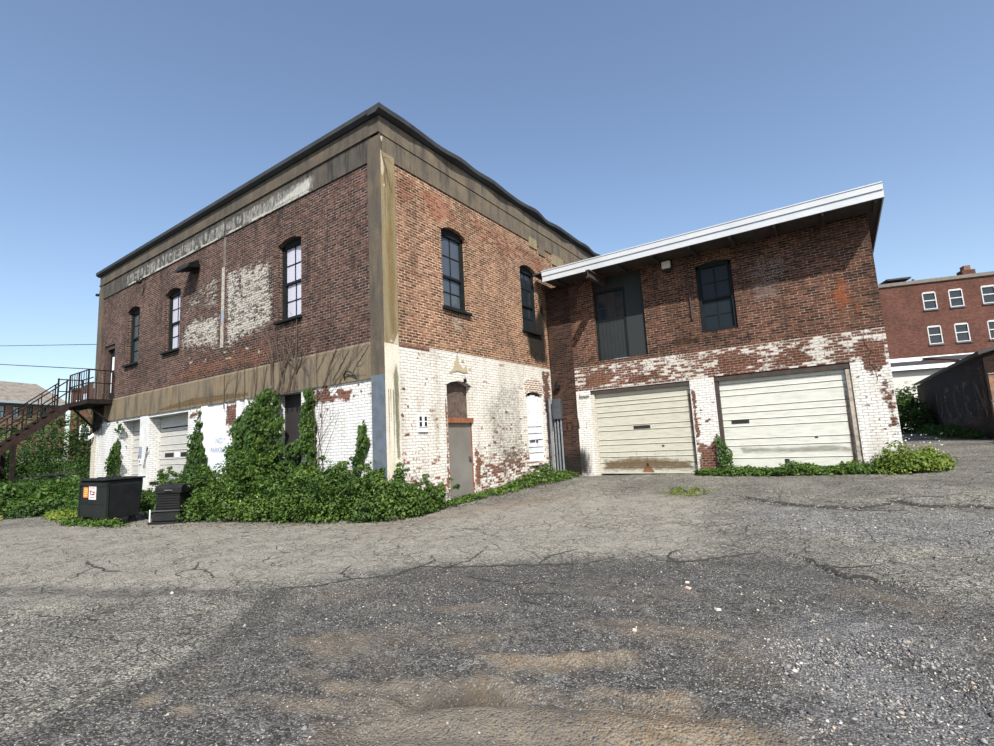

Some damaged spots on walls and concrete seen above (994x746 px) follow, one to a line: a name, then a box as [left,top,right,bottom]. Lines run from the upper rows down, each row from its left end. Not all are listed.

peeling [170,258,273,383]
peeling [312,382,371,418]
peeling [438,399,450,490]
peeling [448,349,471,374]
peeling [475,411,529,489]
peeling [542,371,554,444]
peeling [583,367,669,388]
peeling [691,390,721,469]
peeling [702,342,813,384]
peeling [856,339,900,444]